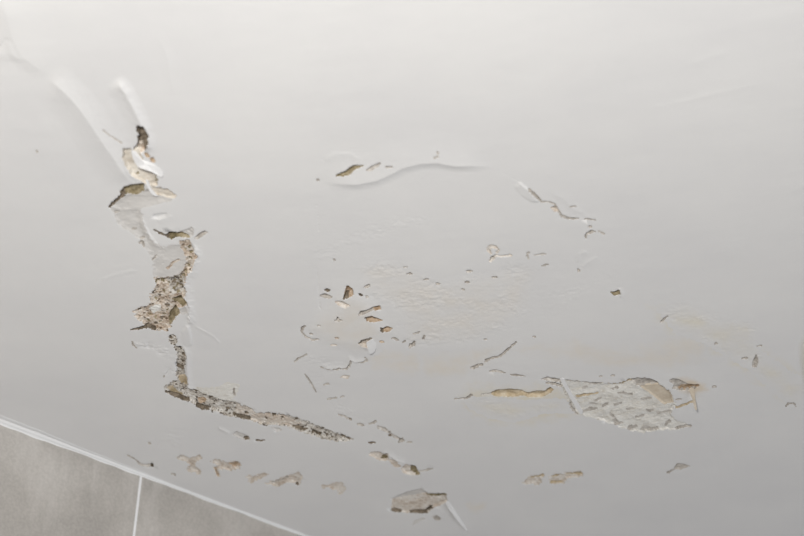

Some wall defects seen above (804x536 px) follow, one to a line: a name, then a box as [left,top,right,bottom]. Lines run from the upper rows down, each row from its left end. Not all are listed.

flaking render [111,126,353,442]
peeling [296,353,433,475]
flaking render [454,374,699,434]
spalling [176,454,303,487]
spalling [521,471,583,485]
flaking render [390,488,468,532]